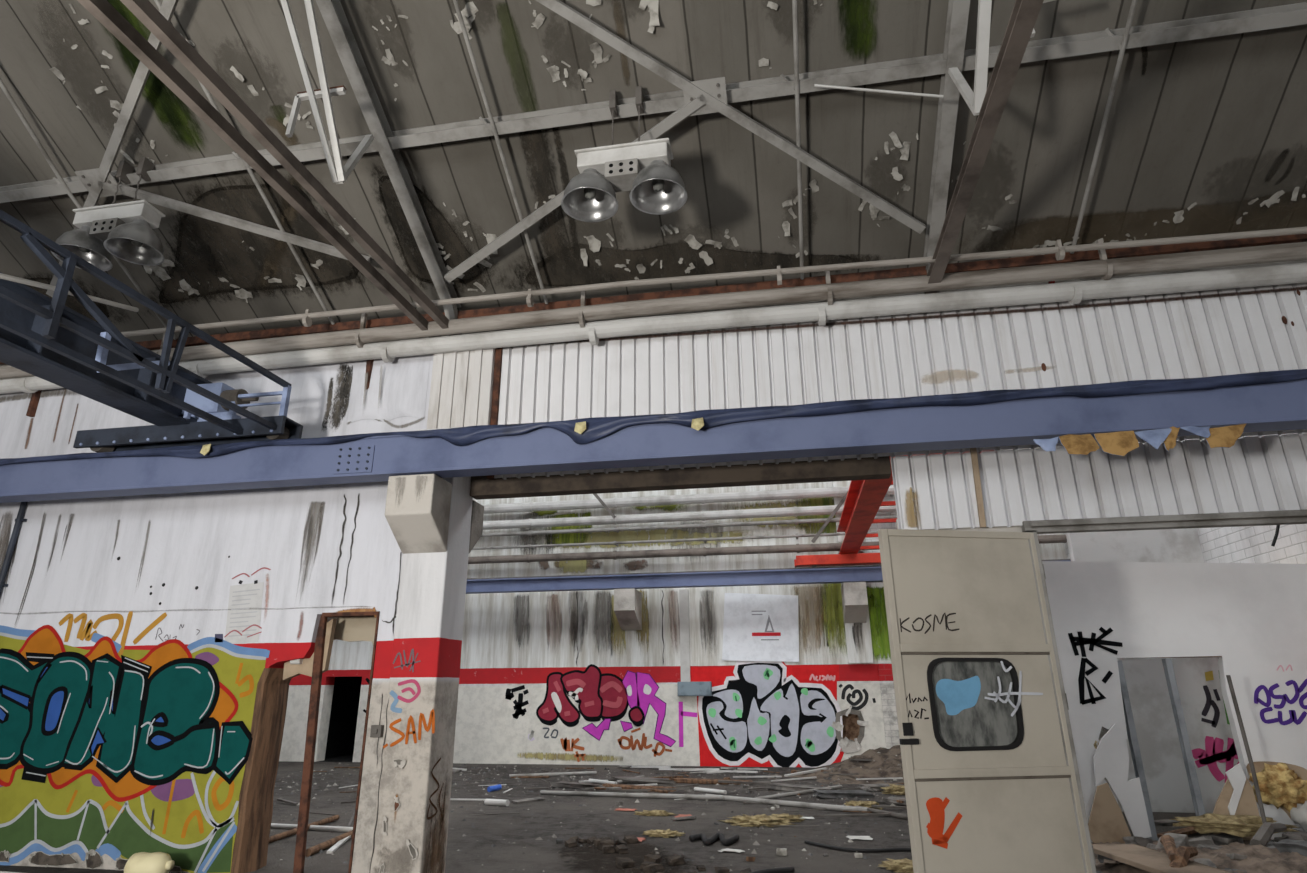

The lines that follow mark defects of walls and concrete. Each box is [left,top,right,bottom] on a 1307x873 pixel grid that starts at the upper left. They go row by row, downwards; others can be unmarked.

peeling [450,1,479,39]
peeling [639,0,660,34]
water stain [114,36,180,125]
peeling [541,42,611,91]
water stain [148,162,371,312]
water stain [373,167,435,288]
water stain [410,127,879,291]
peeling [875,132,918,195]
peeling [1236,176,1307,224]
corrosion [513,286,1307,347]
water stain [22,514,74,609]
water stain [301,502,325,575]